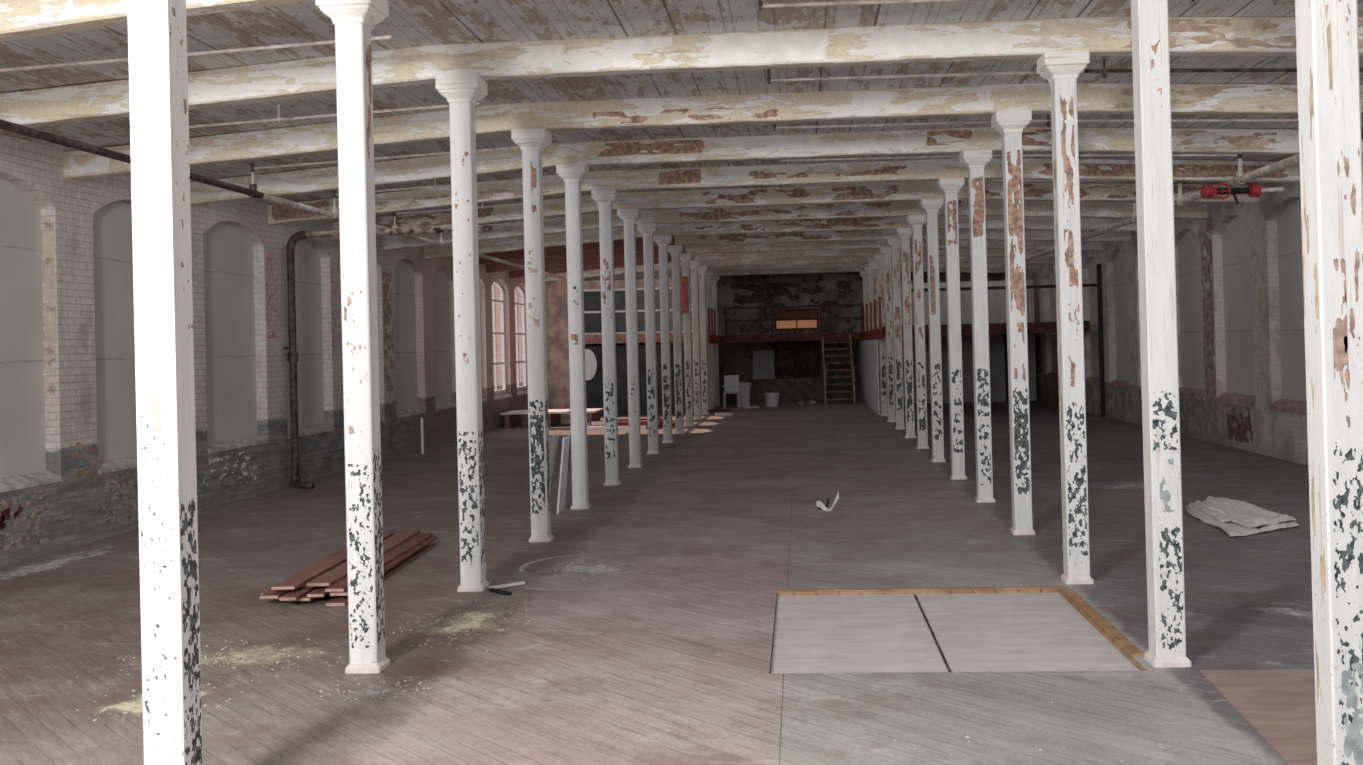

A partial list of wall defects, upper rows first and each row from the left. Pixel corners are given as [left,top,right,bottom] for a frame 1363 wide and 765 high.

peeling [598,139,705,157]
peeling [592,107,736,124]
peeling [659,132,907,242]
peeling [852,87,994,113]
peeling [926,130,972,146]
peeling [1301,181,1319,334]
peeling [72,410,202,765]
peeling [348,448,385,648]
peeling [458,430,486,565]
peeling [529,399,550,515]
peeling [1152,233,1253,651]
peeling [1311,442,1363,765]